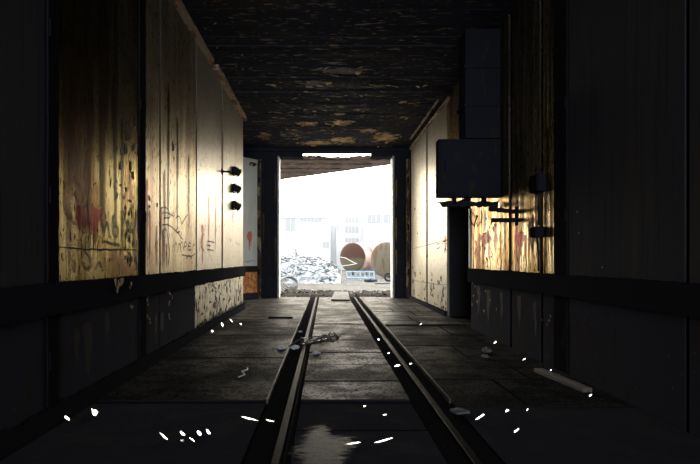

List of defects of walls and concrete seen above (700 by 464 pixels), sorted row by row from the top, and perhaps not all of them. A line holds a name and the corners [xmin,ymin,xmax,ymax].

peeling [294,67,380,99]
water stain [61,0,124,255]
peeling [255,84,402,147]
peeling [196,277,243,329]